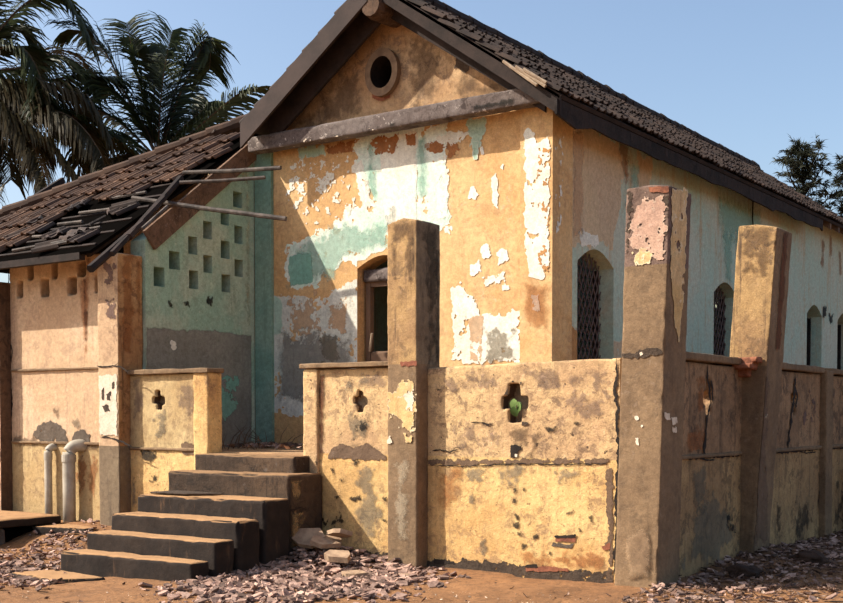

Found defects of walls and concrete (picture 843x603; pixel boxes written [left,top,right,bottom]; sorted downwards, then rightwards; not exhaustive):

peeling [274,123,469,417]
peeling [470,243,509,291]
peeling [523,128,688,342]
peeling [450,281,520,365]
peeling [98,374,118,436]
spalling [328,443,386,461]
peeling [387,379,417,443]
crack [612,348,662,580]
crack [689,367,742,461]
crack [776,378,843,454]